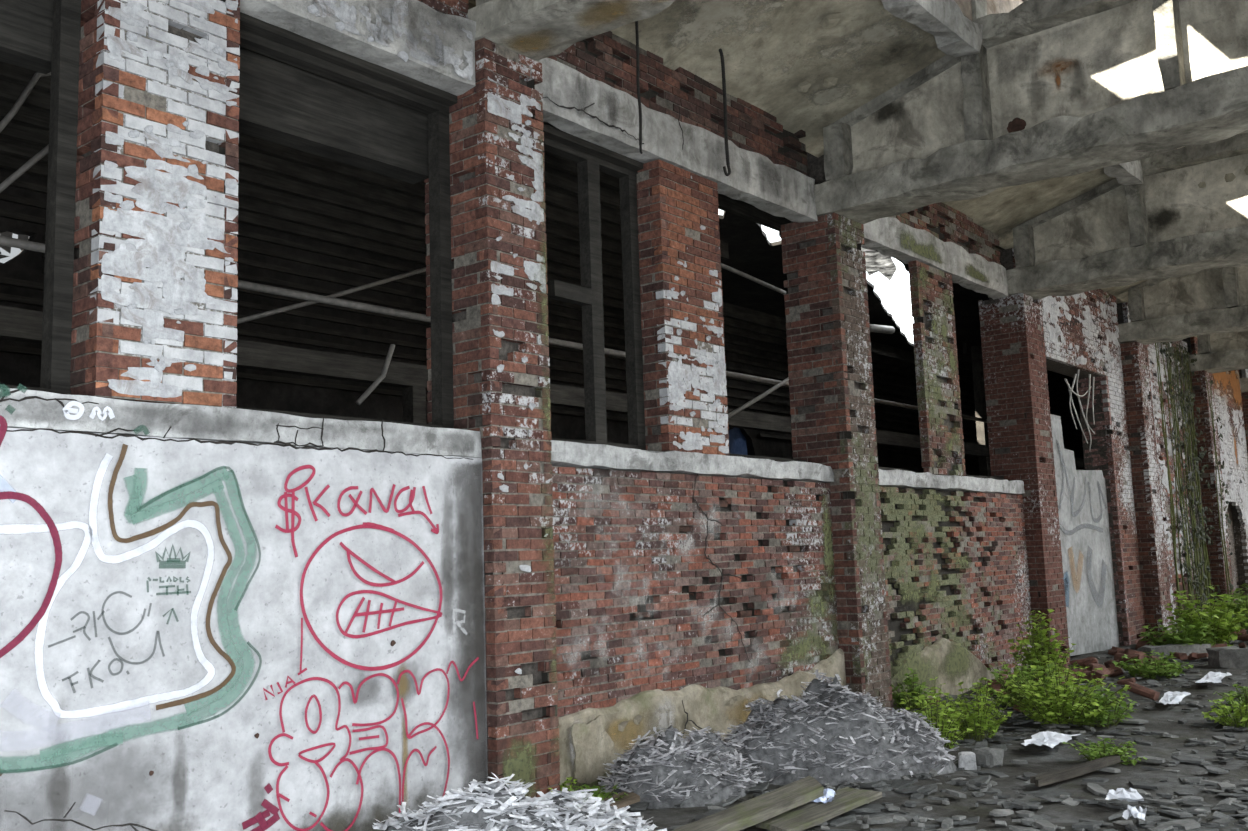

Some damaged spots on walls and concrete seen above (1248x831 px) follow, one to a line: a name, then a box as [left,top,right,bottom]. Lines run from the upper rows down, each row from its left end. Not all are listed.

peeling [107,0,238,106]
peeling [225,179,237,190]
peeling [487,77,544,225]
peeling [101,121,234,398]
peeling [490,252,546,305]
peeling [665,248,688,305]
peeling [668,270,729,453]
peeling [1042,291,1131,374]
peeling [571,714,643,784]
crack [4,802,157,831]
water stain [303,795,425,831]